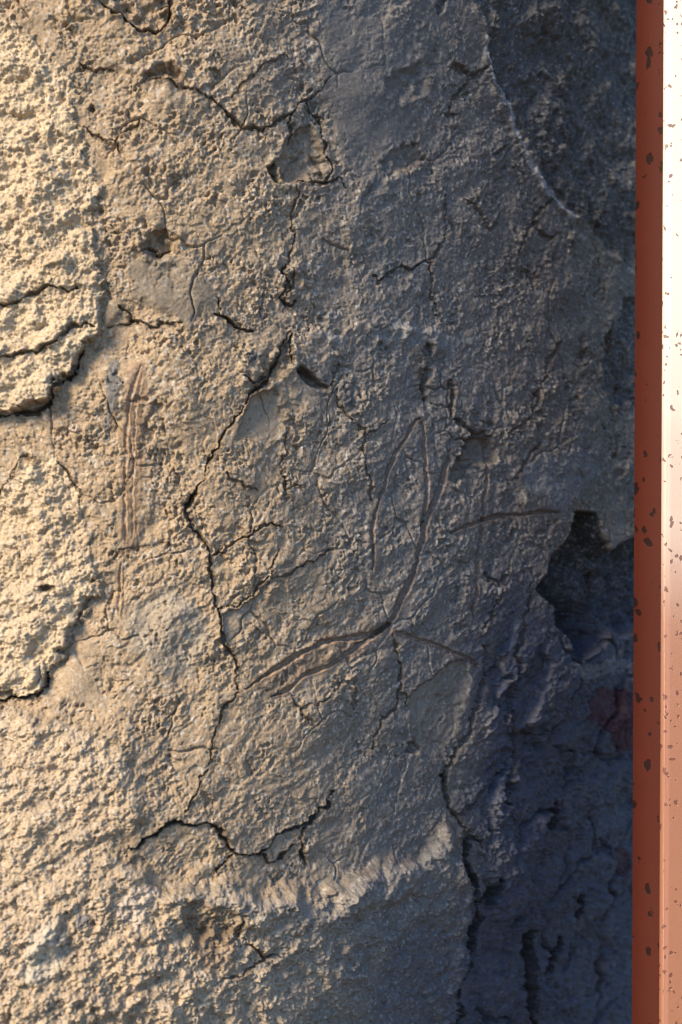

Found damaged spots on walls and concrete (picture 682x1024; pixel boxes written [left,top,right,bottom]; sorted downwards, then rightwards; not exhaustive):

crack [79,63,115,74]
crack [101,0,172,35]
crack [85,121,140,153]
crack [0,283,78,307]
crack [0,304,183,418]
crack [114,52,346,873]
crack [330,364,389,502]
spalling [535,511,634,660]
crack [0,671,50,703]
crack [271,633,409,750]